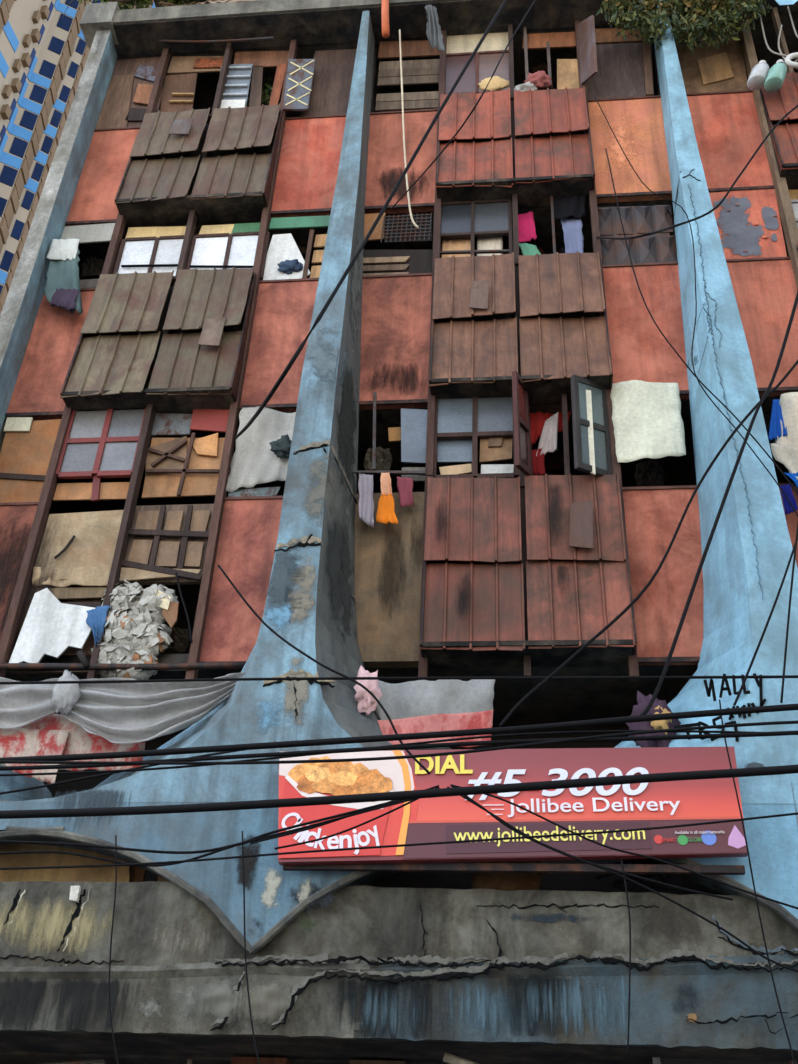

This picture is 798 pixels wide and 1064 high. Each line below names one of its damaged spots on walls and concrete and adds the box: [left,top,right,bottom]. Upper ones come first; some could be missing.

peeling [713,196,779,257]
water stain [304,328,357,641]
peeling [274,534,324,622]
crack [215,903,798,1030]
water stain [0,977,138,1031]
crack [210,1017,229,1031]
crack [686,1012,798,1034]